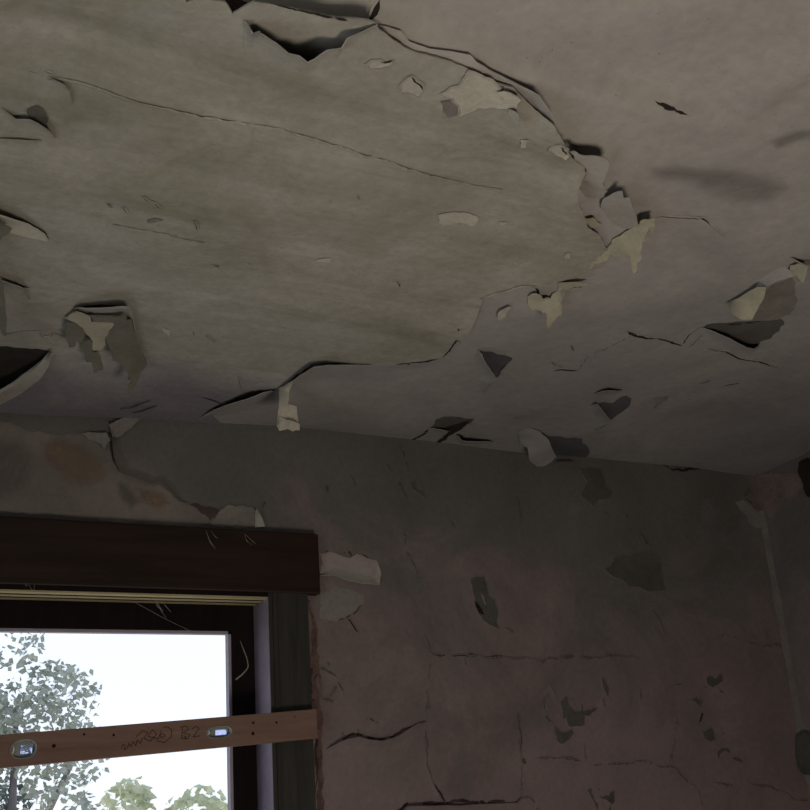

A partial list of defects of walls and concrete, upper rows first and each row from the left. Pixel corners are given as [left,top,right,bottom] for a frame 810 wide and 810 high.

spalling [224,0,258,12]
peeling [243,20,556,128]
peeling [548,144,655,274]
spalling [0,347,54,405]
peeling [65,305,147,393]
peeling [195,329,459,431]
crack [551,326,779,372]
peeling [703,257,810,354]
peeling [0,400,266,530]
peeling [308,550,381,810]
crack [424,634,639,805]
crack [516,711,808,810]